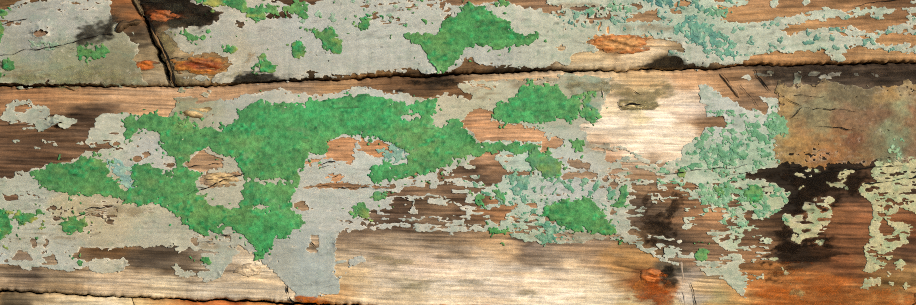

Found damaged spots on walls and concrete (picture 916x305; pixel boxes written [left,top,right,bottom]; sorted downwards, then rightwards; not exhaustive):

peeling [0,0,148,89]
crack [138,0,184,86]
peeling [164,0,916,84]
peeling [0,71,916,301]
water stain [778,165,875,218]
water stain [762,227,839,273]